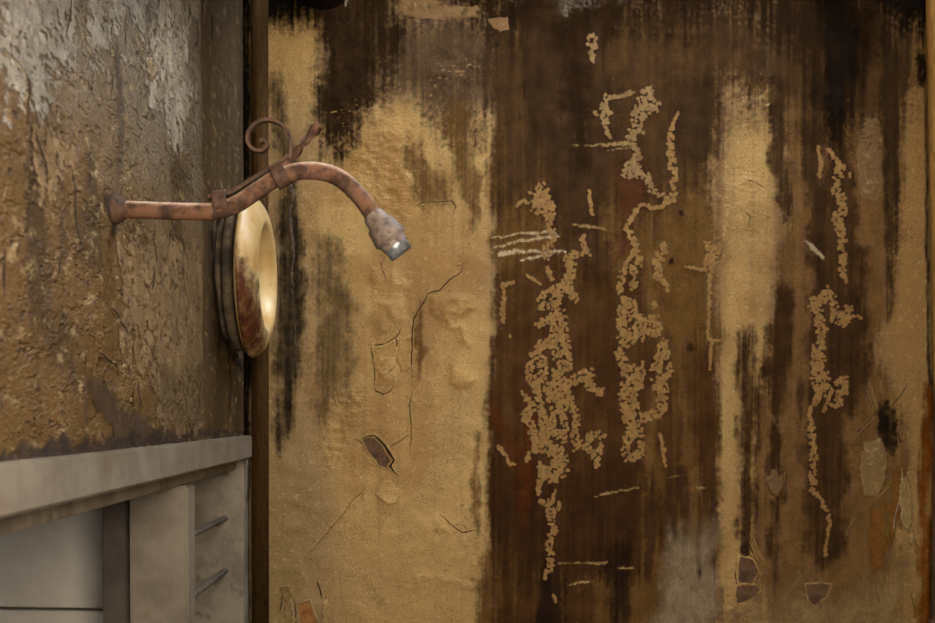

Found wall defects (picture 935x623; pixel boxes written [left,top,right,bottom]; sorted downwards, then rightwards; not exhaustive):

peeling [0,0,200,216]
water stain [367,0,925,623]
crack [369,255,475,454]
spalling [354,432,401,505]
peeling [860,438,889,498]
crack [439,513,478,535]
peeling [899,476,913,534]
spalling [280,585,318,623]
spalling [733,555,762,606]